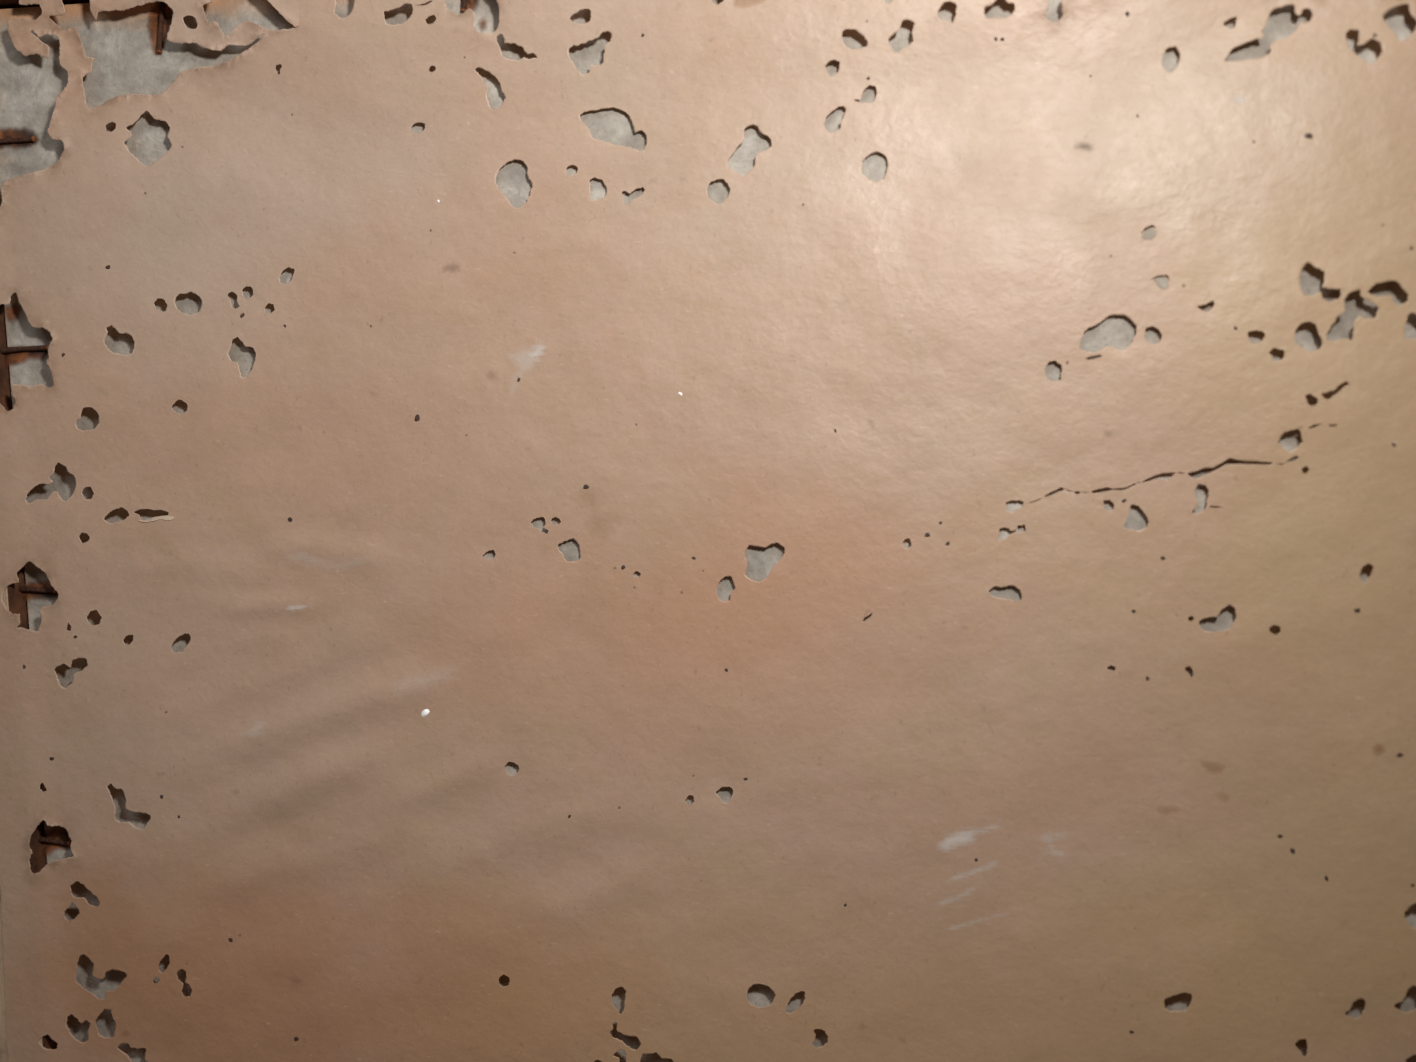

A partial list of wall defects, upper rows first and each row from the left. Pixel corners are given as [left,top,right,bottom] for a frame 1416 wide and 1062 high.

corrosion [0,129,38,148]
corrosion [4,350,48,365]